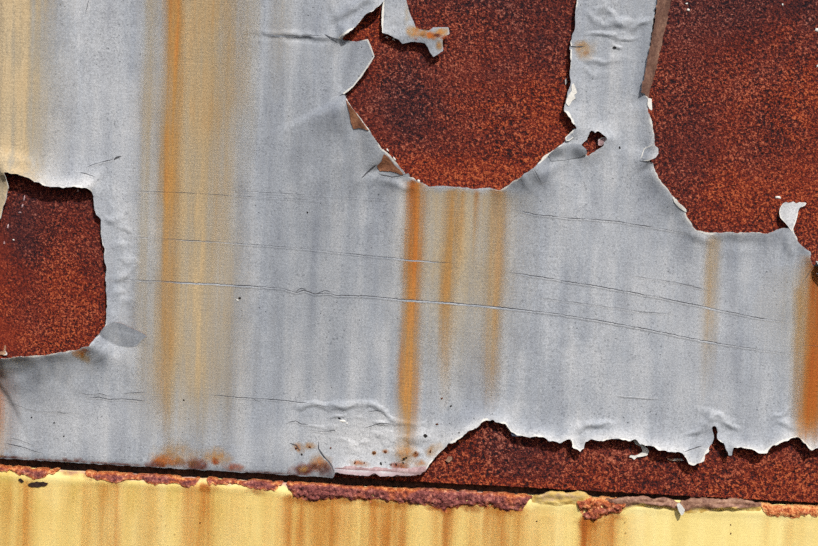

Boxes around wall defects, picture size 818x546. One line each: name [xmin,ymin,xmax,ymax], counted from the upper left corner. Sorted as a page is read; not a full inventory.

peeling [0,172,147,365]
corrosion [154,0,241,412]
corrosion [372,181,504,468]
peeling [336,0,607,190]
peeling [640,0,818,275]
corrosion [798,261,818,432]
corrosion [85,450,532,546]
peeling [334,420,818,515]
corrosion [760,501,818,519]